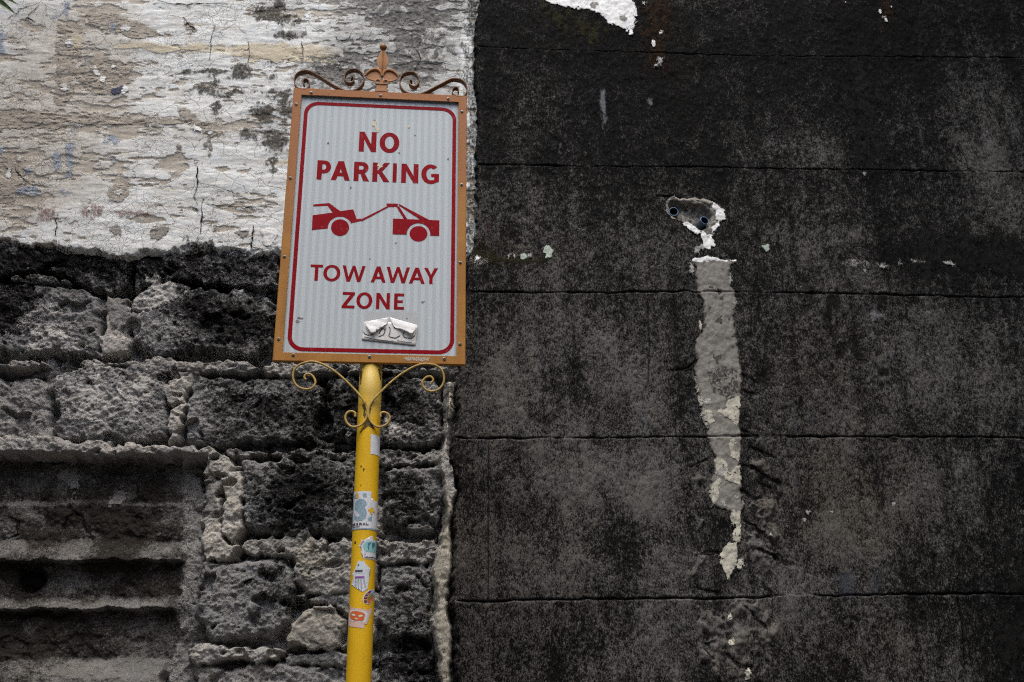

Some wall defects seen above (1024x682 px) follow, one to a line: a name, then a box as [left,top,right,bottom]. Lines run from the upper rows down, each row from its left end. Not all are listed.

peeling [0,12,225,156]
peeling [0,150,27,204]
peeling [107,180,129,202]
peeling [150,225,169,240]
peeling [234,227,278,249]
spalling [666,196,726,236]
peeling [708,273,737,324]
peeling [694,376,744,580]